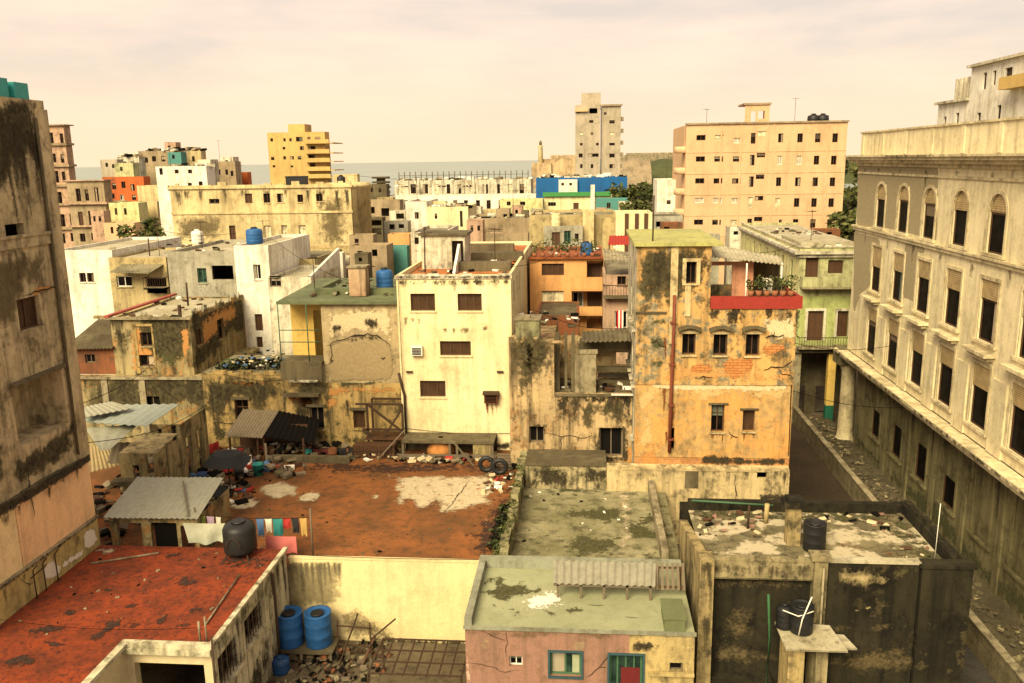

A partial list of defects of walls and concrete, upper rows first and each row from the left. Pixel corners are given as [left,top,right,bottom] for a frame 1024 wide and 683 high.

water stain [0,101,41,217]
water stain [84,291,329,440]
peeling [326,307,407,342]
water stain [512,332,551,396]
water stain [631,248,745,328]
peeling [626,318,795,464]
water stain [719,647,767,659]
water stain [832,650,910,669]